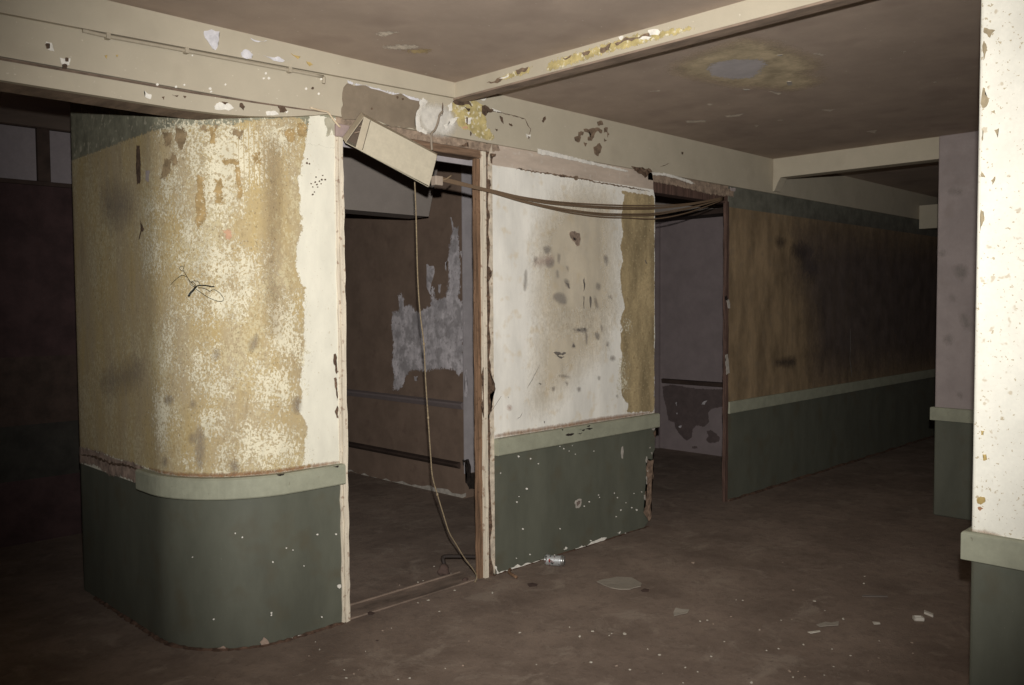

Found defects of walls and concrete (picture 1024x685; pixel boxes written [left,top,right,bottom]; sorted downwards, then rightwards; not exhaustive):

peeling [45,42,71,69]
peeling [204,29,220,50]
peeling [241,38,313,66]
peeling [487,67,530,83]
peeling [547,26,692,71]
damp [680,41,815,91]
peeling [574,121,609,156]
peeling [72,83,513,483]
peeling [617,191,723,449]
spalling [614,428,656,521]